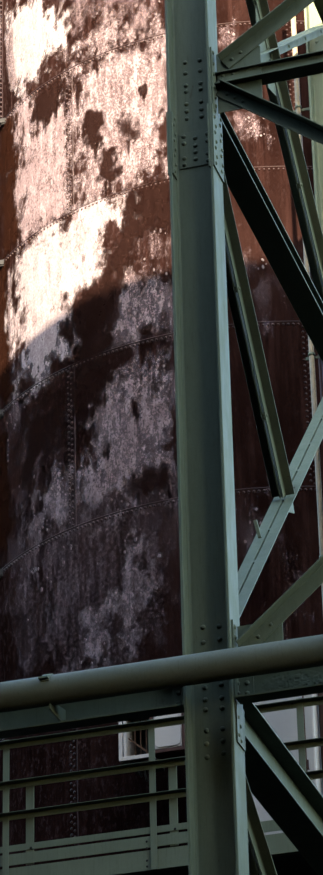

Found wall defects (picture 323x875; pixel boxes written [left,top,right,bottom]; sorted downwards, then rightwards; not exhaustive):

corrosion [0,78,140,408]
peeling [0,0,168,462]
corrosion [0,177,172,564]
corrosion [138,83,147,101]